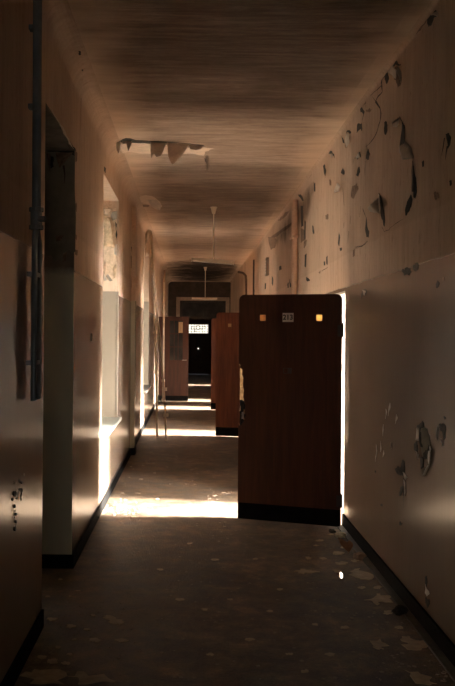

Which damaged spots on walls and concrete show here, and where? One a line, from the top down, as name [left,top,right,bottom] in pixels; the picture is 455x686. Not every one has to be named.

crack [367,72,388,146]
peeling [116,138,214,165]
peeling [351,145,370,199]
peeling [384,116,424,216]
peeling [103,207,117,281]
flaking render [298,194,314,267]
peeling [360,194,385,238]
peeling [414,416,446,476]